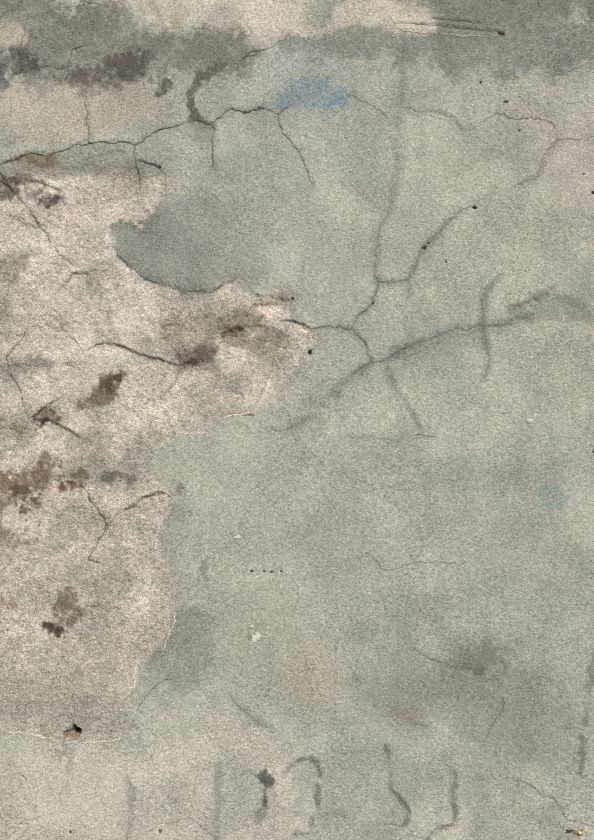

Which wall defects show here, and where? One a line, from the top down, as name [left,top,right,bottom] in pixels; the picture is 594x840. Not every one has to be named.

crack [6,329,80,438]
crack [52,315,179,394]
crack [0,100,311,285]
flaking render [0,173,315,747]
damp [0,0,594,446]
crack [283,205,502,376]
crack [401,44,590,181]
crack [514,779,594,840]